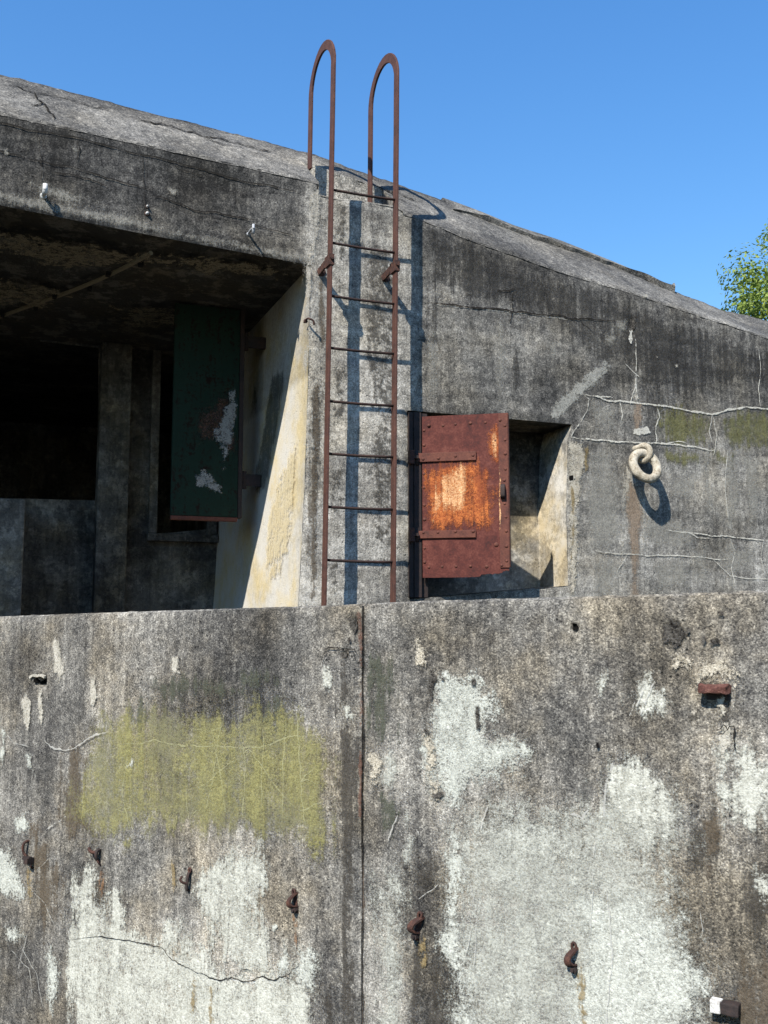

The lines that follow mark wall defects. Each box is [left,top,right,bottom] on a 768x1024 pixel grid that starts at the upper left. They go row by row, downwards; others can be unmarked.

crack [0,85,298,236]
crack [431,288,613,331]
peeling [195,469,222,493]
peeling [197,389,238,470]
rust [424,426,501,530]
crack [571,339,768,585]
efflorescence [52,637,64,684]
water stain [412,638,427,666]
efflorescence [21,690,43,730]
water stain [669,653,740,880]
crack [77,936,309,988]
water stain [713,861,768,1024]